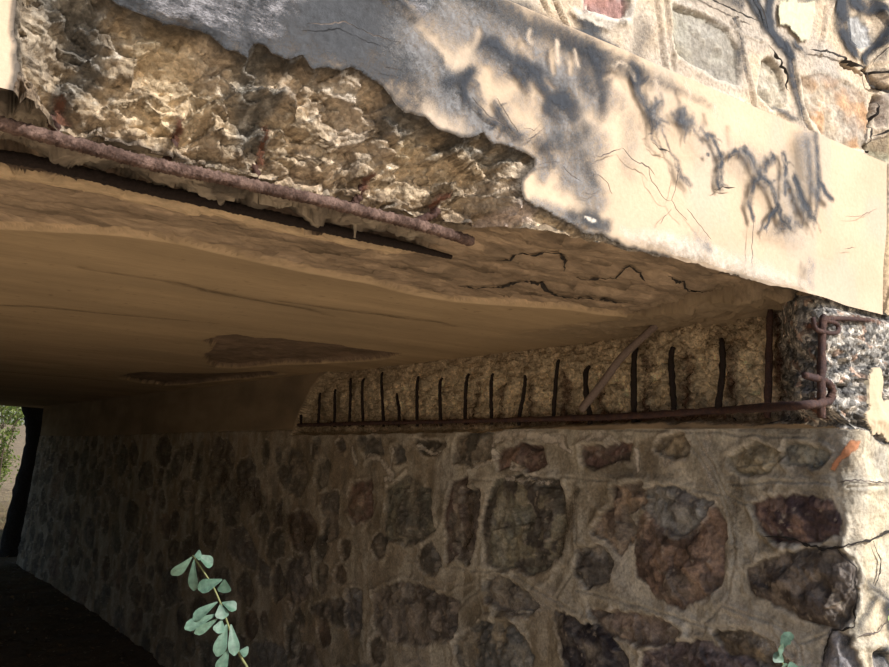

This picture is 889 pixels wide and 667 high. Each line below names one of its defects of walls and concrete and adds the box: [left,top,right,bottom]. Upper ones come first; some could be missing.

crack [810,47,889,153]
rust [360,172,377,195]
spalling [0,0,889,445]
crack [540,144,711,239]
crack [460,252,645,304]
crack [669,276,713,293]
rust [357,314,786,427]
crack [842,479,889,504]
crack [763,530,889,662]